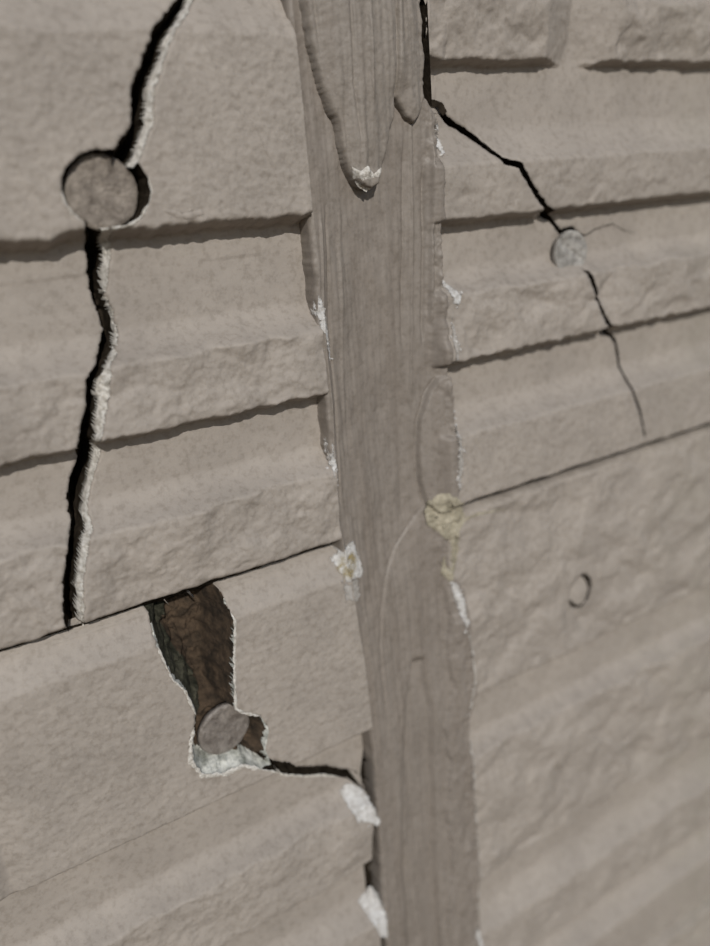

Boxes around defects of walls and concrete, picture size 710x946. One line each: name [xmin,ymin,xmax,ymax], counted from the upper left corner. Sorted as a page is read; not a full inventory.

crack [111,0,193,169]
crack [432,99,634,236]
crack [62,223,118,632]
crack [584,270,646,437]
spalling [144,584,271,778]